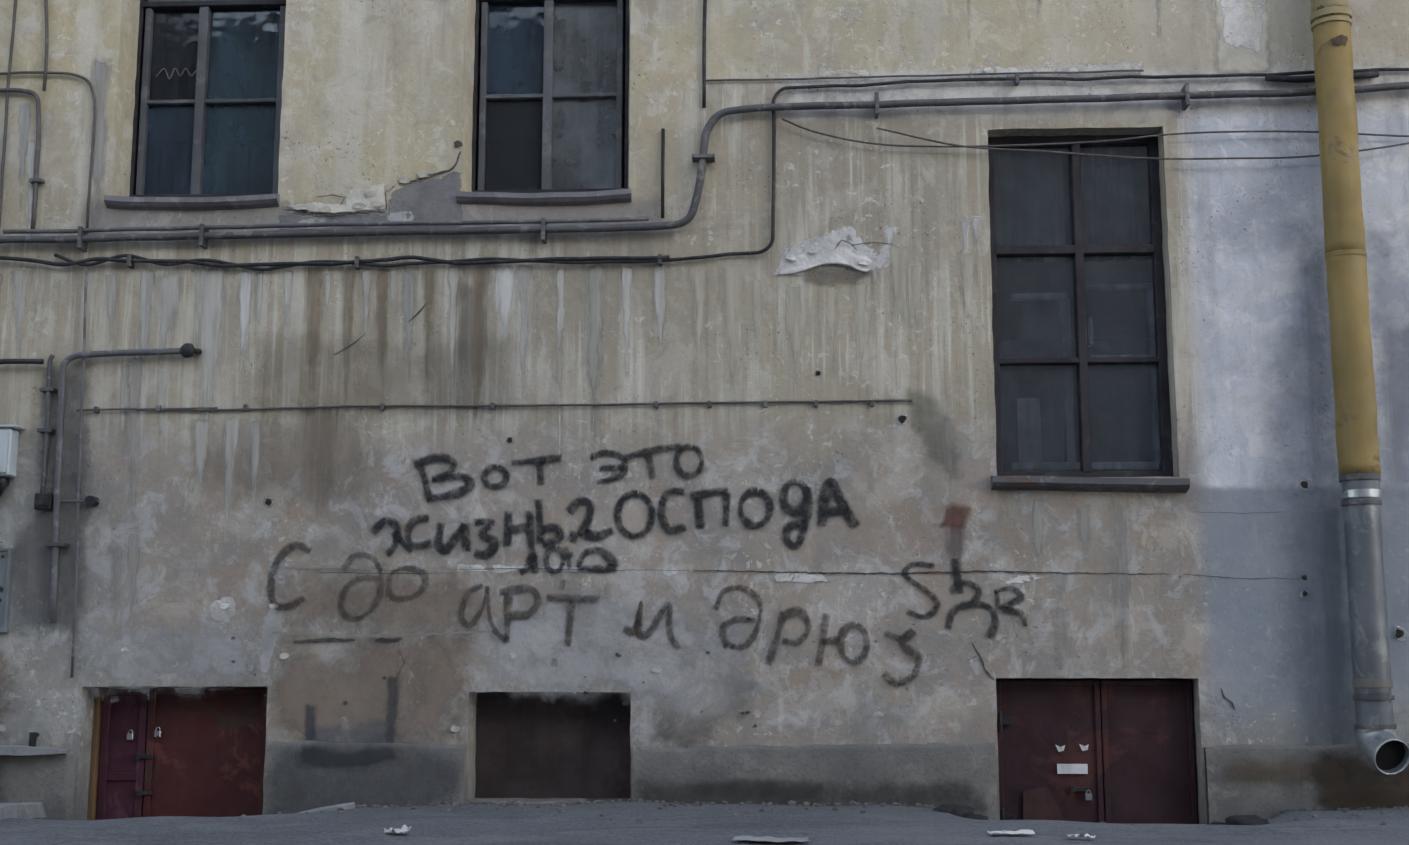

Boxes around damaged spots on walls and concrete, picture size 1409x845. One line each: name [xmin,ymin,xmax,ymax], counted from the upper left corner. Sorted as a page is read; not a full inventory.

rust [1328,35,1348,46]
leakage [19,104,34,236]
flaking render [278,171,463,230]
leakage [120,266,263,498]
leakage [448,267,459,371]
leakage [494,266,531,391]
leakage [557,270,565,383]
leakage [587,265,603,436]
leakage [622,267,632,368]
leakage [654,264,666,345]
leakage [225,417,260,532]